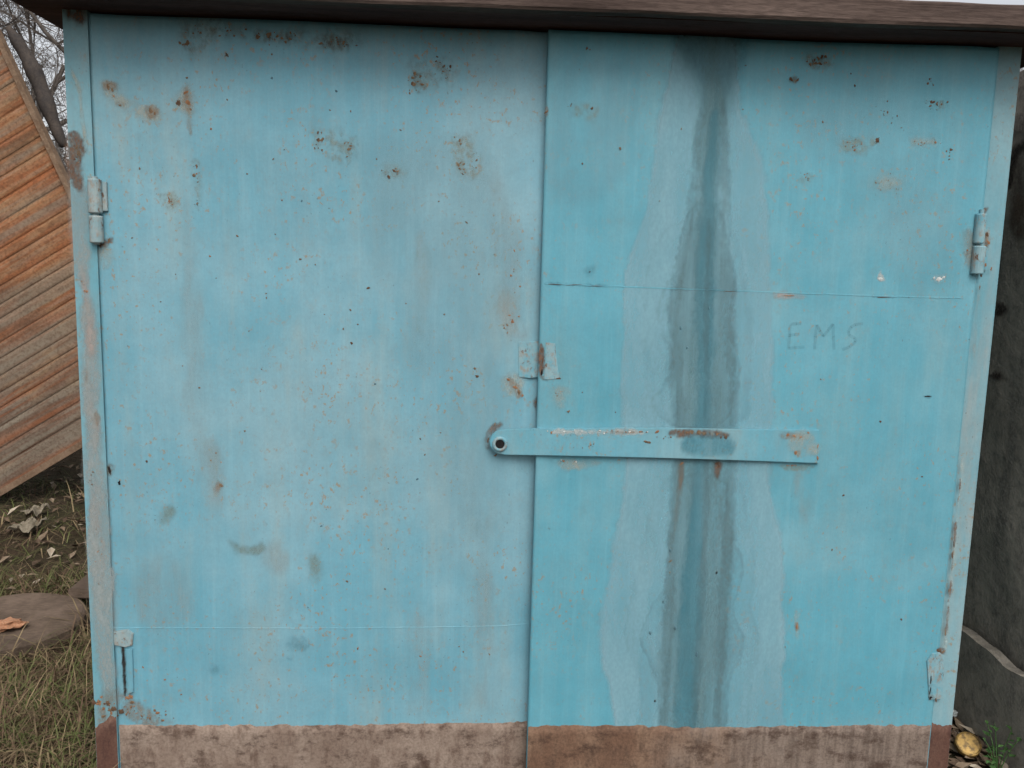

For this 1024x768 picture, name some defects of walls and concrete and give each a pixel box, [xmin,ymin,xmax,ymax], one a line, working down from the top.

rust [65,131,84,190]
leakage [624,35,768,428]
rust [547,429,731,451]
rust [91,694,174,723]
leakage [603,457,731,728]
leakage [737,461,785,726]